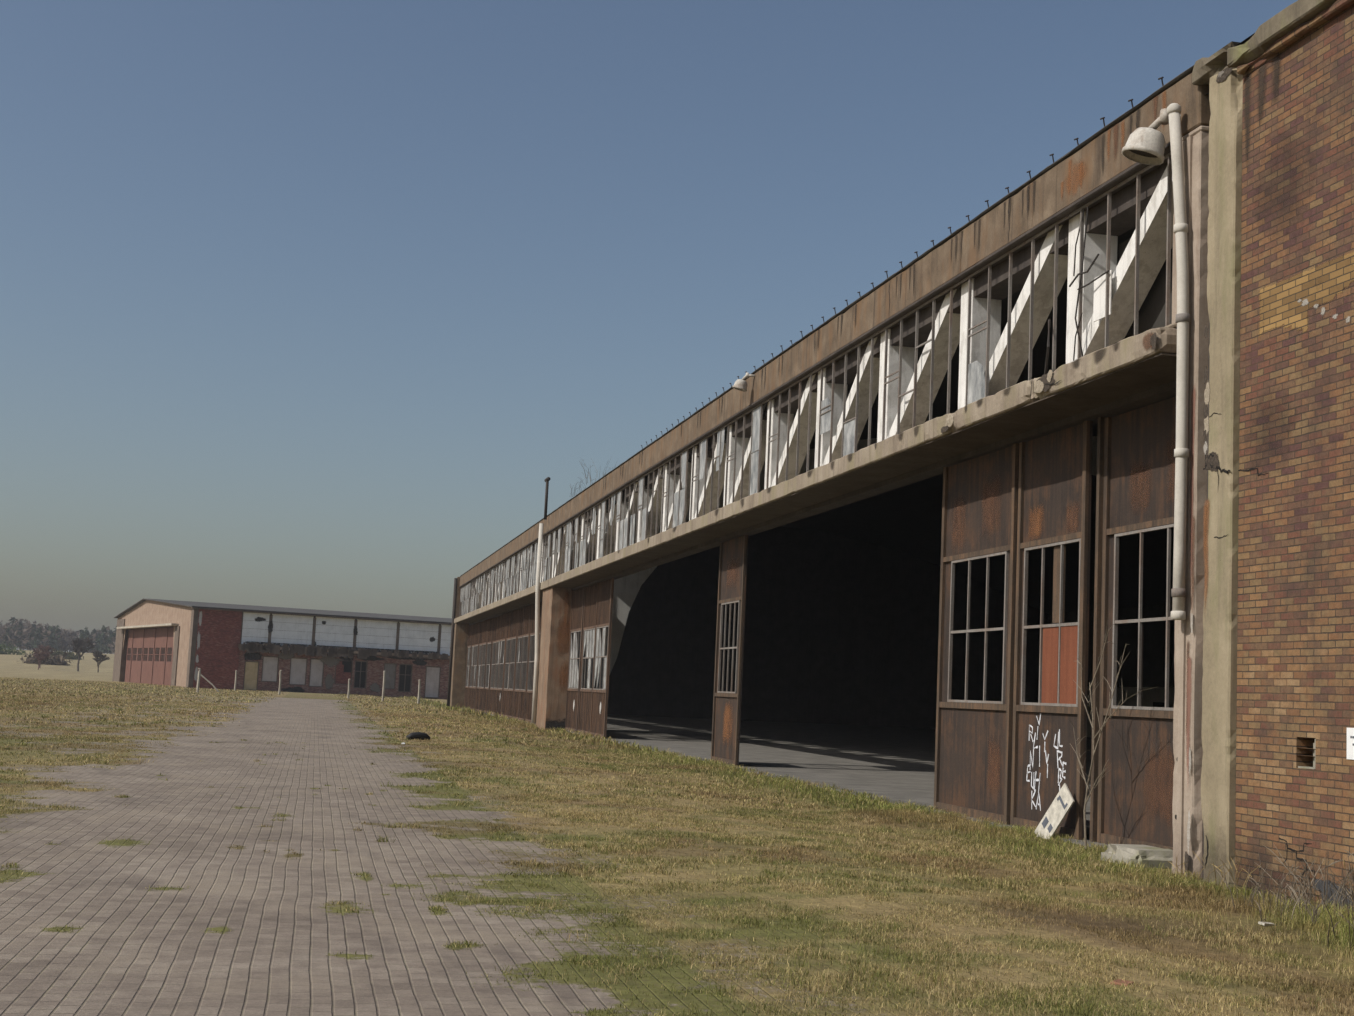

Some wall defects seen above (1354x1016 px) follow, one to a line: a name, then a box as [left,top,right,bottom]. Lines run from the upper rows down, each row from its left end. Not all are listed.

water stain [1245,55,1280,152]
water stain [1297,299,1350,323]